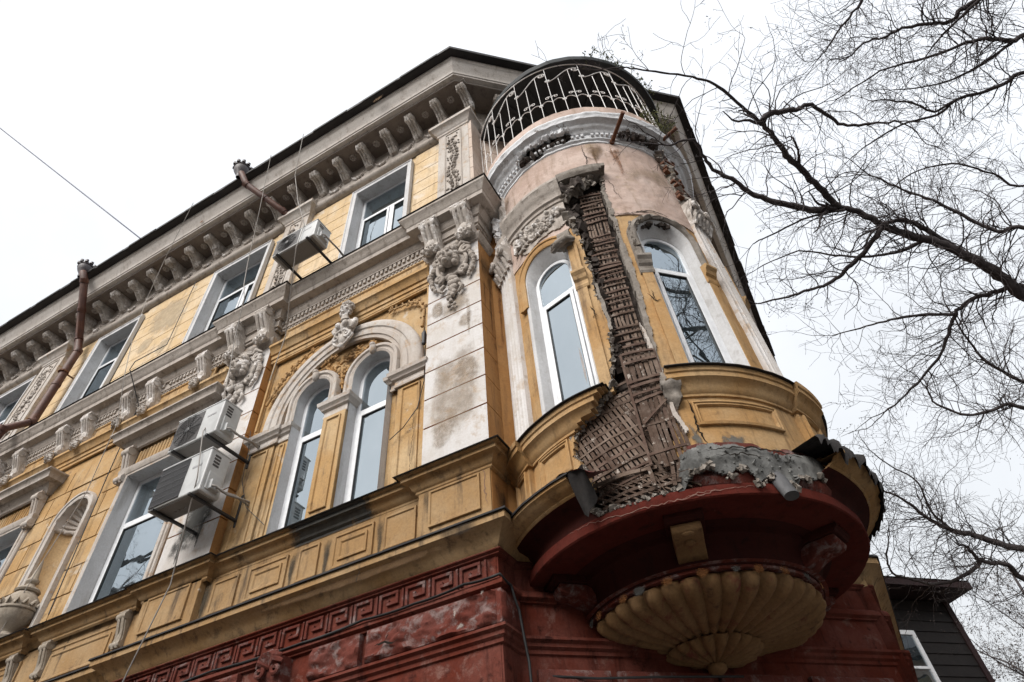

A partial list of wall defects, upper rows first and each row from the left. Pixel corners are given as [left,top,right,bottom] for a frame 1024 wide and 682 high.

spalling [617,128,692,204]
spalling [556,174,715,517]
peeling [726,463,776,488]
peeling [790,472,828,493]
damp [171,502,214,561]
damp [289,497,373,579]